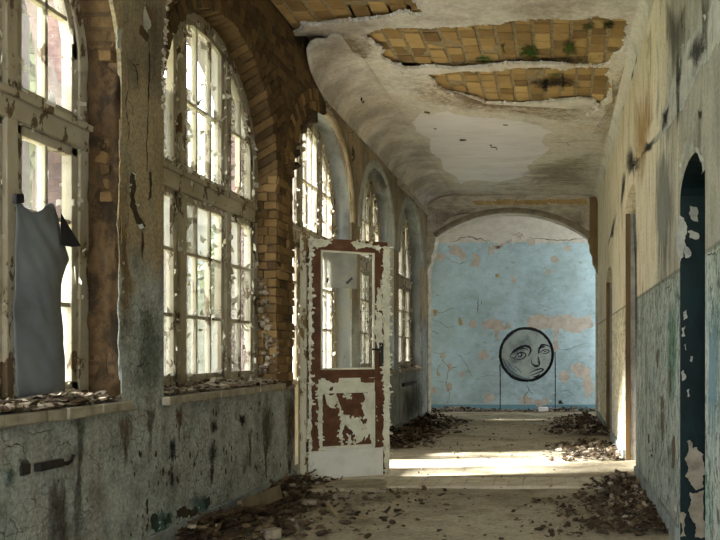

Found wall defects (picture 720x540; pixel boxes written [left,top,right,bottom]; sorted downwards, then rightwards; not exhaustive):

flaking render [360,15,631,116]
damp [662,1,708,128]
flaking render [71,28,146,397]
flaking render [161,0,422,402]
peeling [412,111,551,184]
damp [620,100,654,207]
damp [656,157,672,256]
peeling [675,206,700,262]
damp [50,486,66,540]
mould [151,513,173,532]
damp [262,407,273,474]
peeling [662,440,705,538]